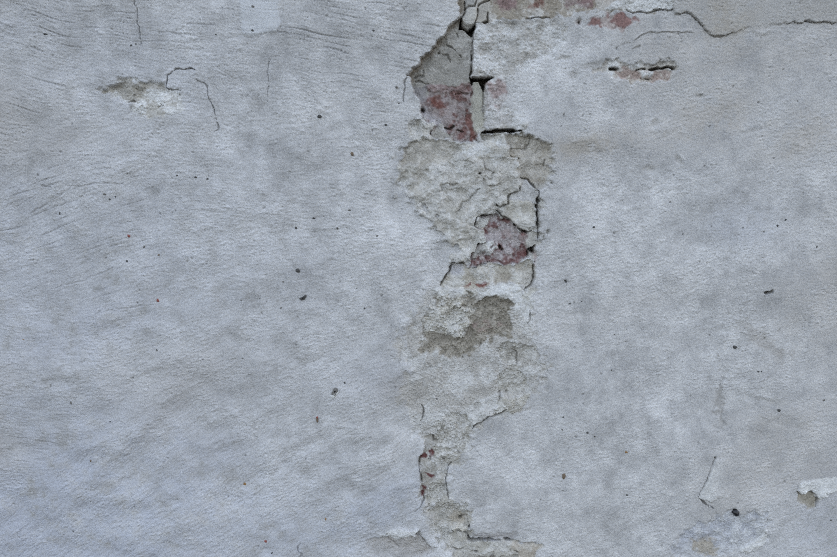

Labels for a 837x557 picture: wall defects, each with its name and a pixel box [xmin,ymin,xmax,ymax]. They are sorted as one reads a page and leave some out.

crack [634,12,734,42]
crack [787,19,837,27]
spalling [99,78,183,120]
spalling [392,0,678,557]
spalling [797,478,837,511]
spalling [671,508,772,557]